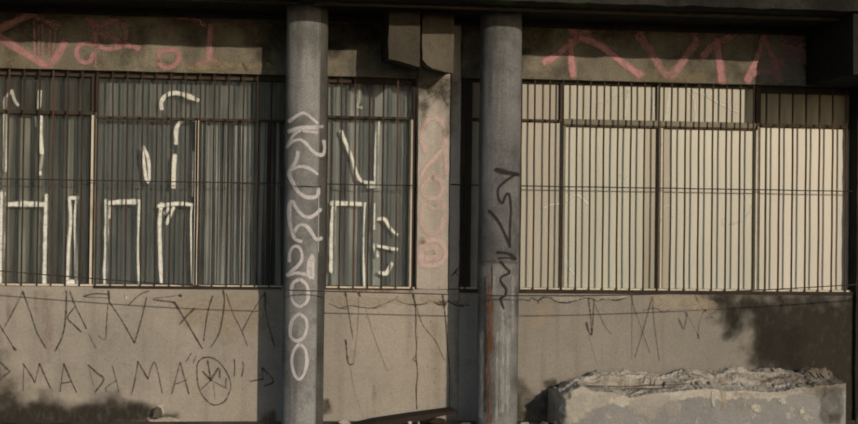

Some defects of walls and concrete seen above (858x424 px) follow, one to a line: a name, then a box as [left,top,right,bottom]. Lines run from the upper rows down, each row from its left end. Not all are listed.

damp [0,393,150,422]
crack [331,299,470,409]
peeling [566,394,612,423]
damp [714,295,854,420]